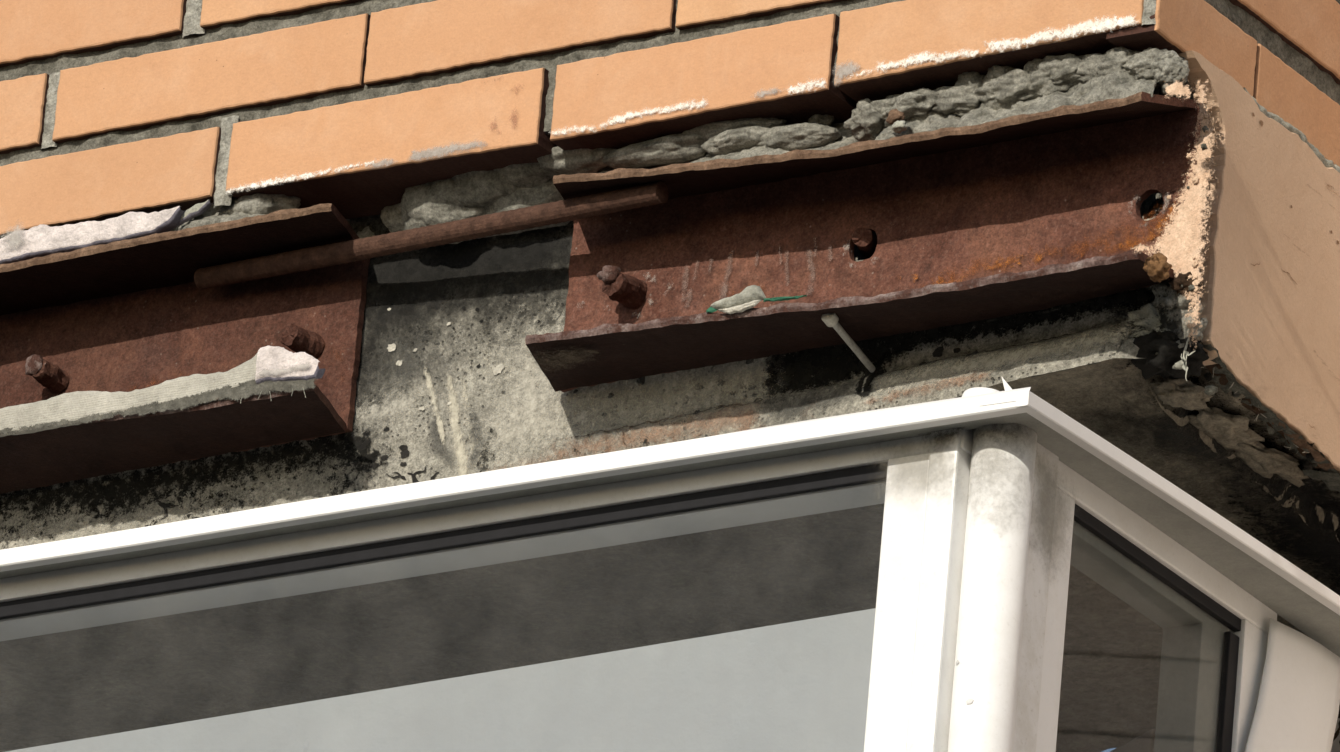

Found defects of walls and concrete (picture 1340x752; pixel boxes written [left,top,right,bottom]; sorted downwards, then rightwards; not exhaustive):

flaking render [0,199,214,264]
rust [1098,207,1178,282]
flaking render [0,346,325,437]
damp [0,287,1162,550]
spalling [1125,272,1309,487]
damp [1099,368,1340,596]